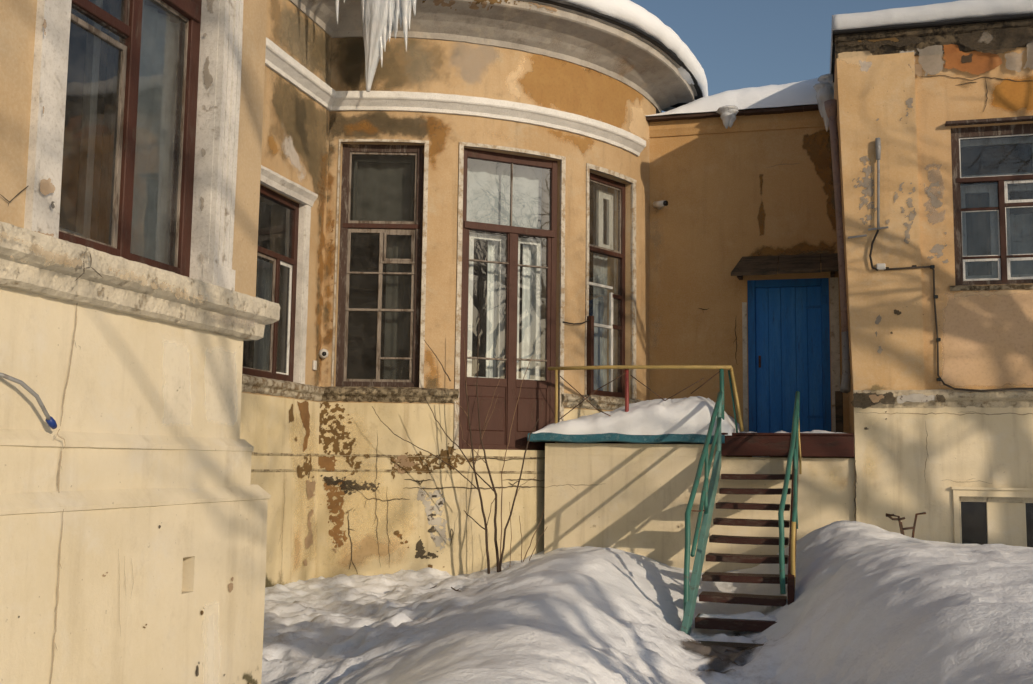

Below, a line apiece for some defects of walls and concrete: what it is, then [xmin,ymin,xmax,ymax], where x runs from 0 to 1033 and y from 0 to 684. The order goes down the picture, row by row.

leakage [269,75,450,199]
leakage [549,130,594,153]
leakage [507,54,649,140]
leakage [803,130,836,231]
peeling [894,181,943,244]
spalling [901,26,1033,77]
crack [922,75,1023,112]
leakage [992,76,1033,111]
spalling [851,385,946,420]
crack [50,254,102,684]
flaking render [289,401,380,566]
flaking render [390,443,477,568]